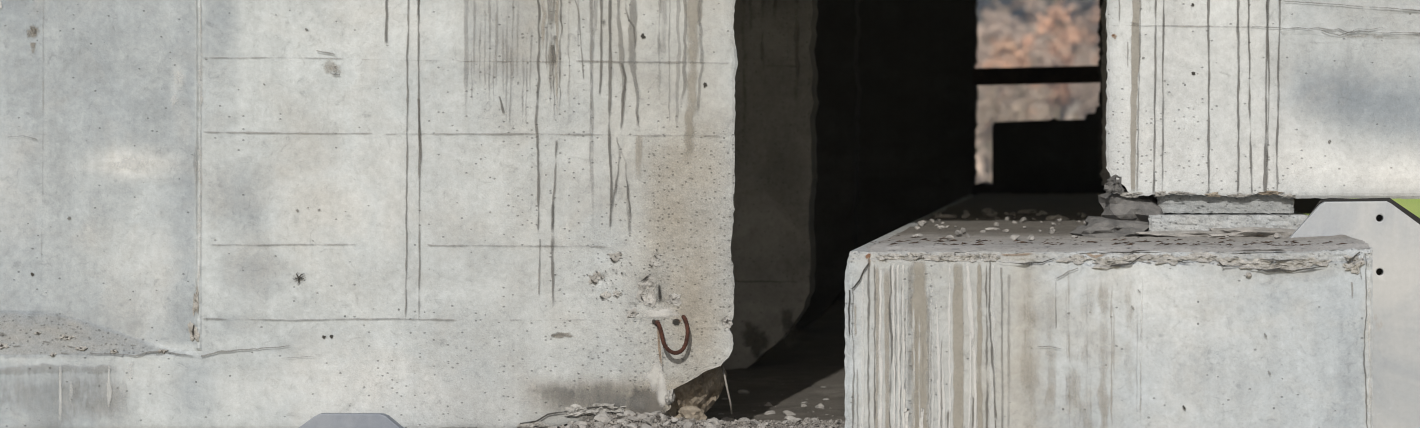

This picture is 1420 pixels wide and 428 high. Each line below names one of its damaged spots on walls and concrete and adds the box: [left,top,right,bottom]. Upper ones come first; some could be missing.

leakage [535,0,580,295]
leakage [581,0,639,229]
leakage [683,0,701,149]
spalling [588,249,682,318]
spalling [663,364,727,421]
leakage [851,260,1003,428]
spalling [876,249,1365,278]